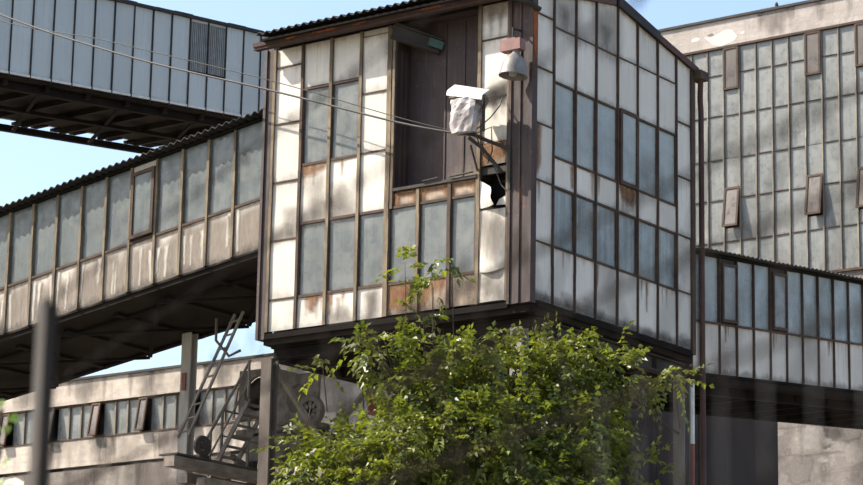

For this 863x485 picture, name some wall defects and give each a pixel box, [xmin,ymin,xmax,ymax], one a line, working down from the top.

peeling [691,29,745,47]
leakage [0,207,260,330]
corrosion [305,293,331,313]
corrosion [388,279,445,308]